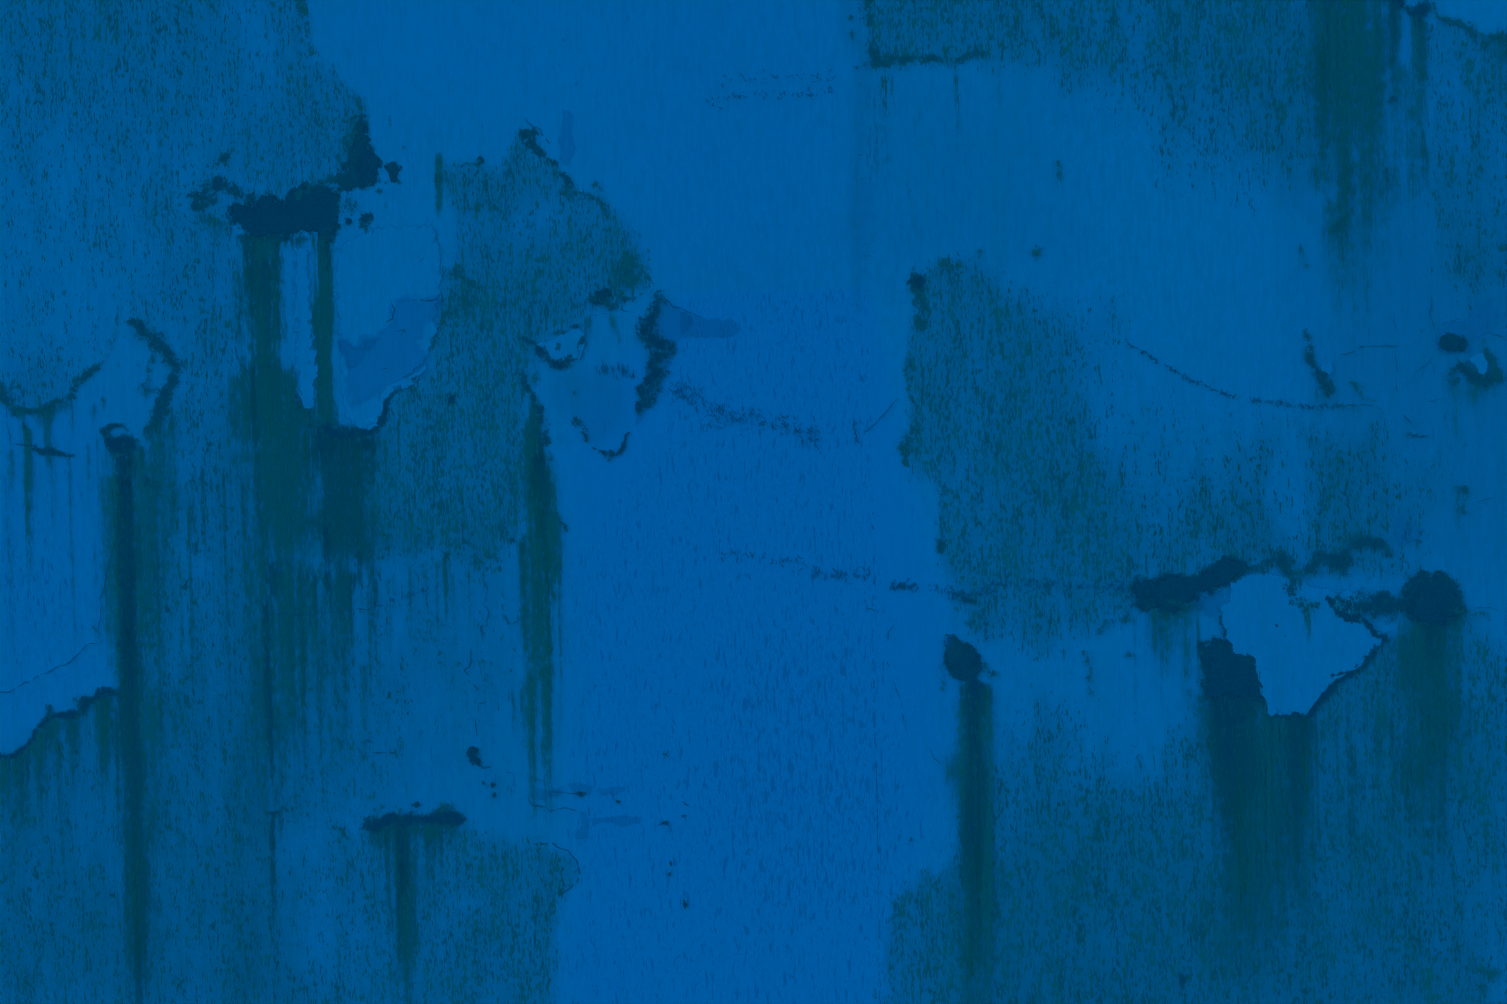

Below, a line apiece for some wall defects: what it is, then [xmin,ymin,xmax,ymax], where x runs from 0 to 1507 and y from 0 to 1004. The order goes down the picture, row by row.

peeling [518,117,609,215]
peeling [186,114,486,438]
peeling [519,287,700,415]
peeling [572,416,630,461]
peeling [1127,534,1496,820]